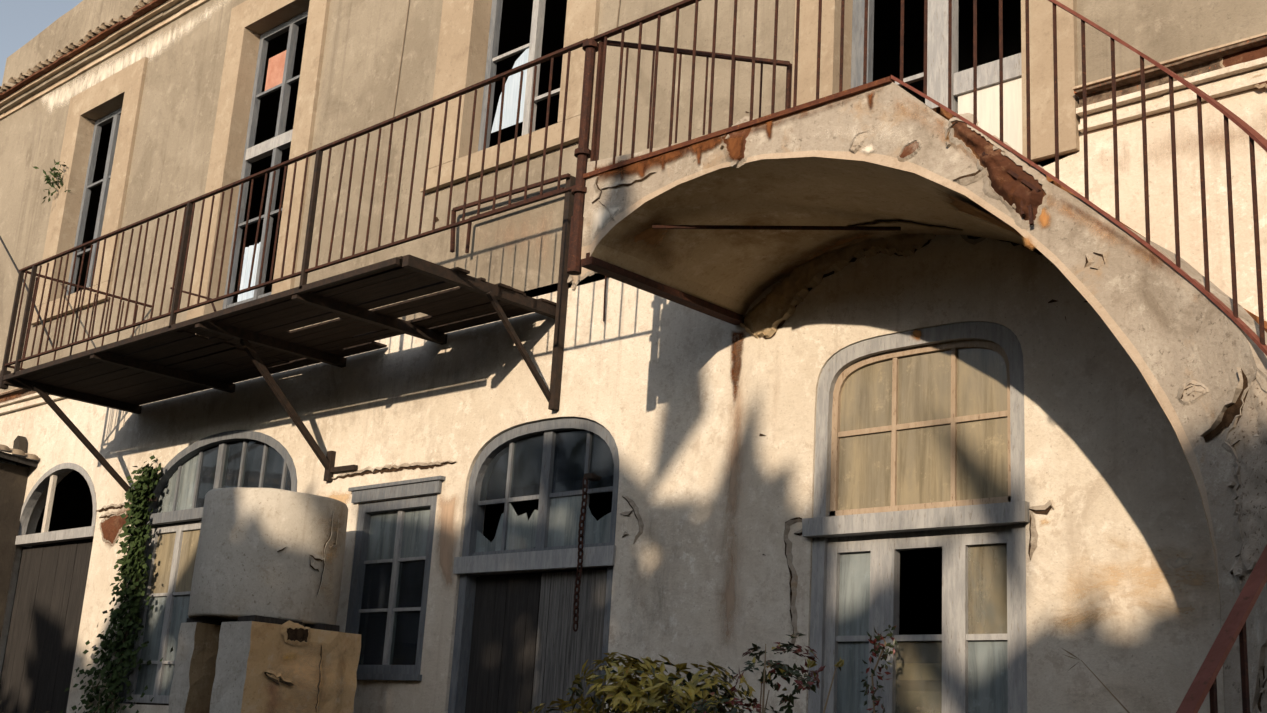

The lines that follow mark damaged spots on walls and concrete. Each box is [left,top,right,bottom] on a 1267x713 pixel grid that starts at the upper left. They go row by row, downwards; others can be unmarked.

rust [596,120,772,180]
flaking render [849,130,873,154]
flaking render [897,138,922,162]
flaking render [945,113,1053,229]
water stain [729,412,739,512]
flaking render [1200,367,1267,593]
crack [783,517,802,645]
flaking render [1255,607,1267,713]